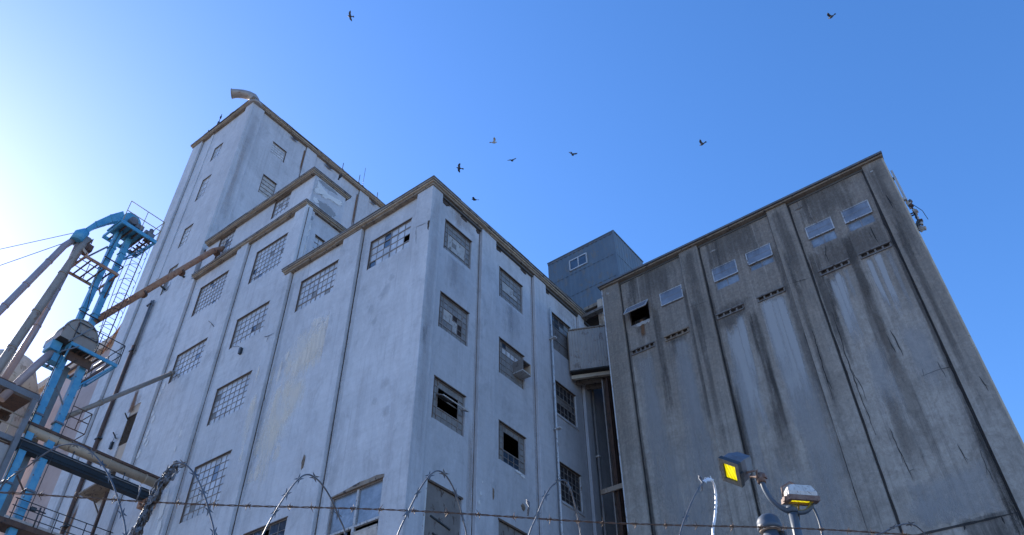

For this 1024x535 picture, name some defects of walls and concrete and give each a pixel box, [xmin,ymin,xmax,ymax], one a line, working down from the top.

leakage [831,273,859,333]
leakage [867,254,898,309]
leakage [727,316,767,420]
leakage [762,297,814,415]
crack [812,313,913,479]